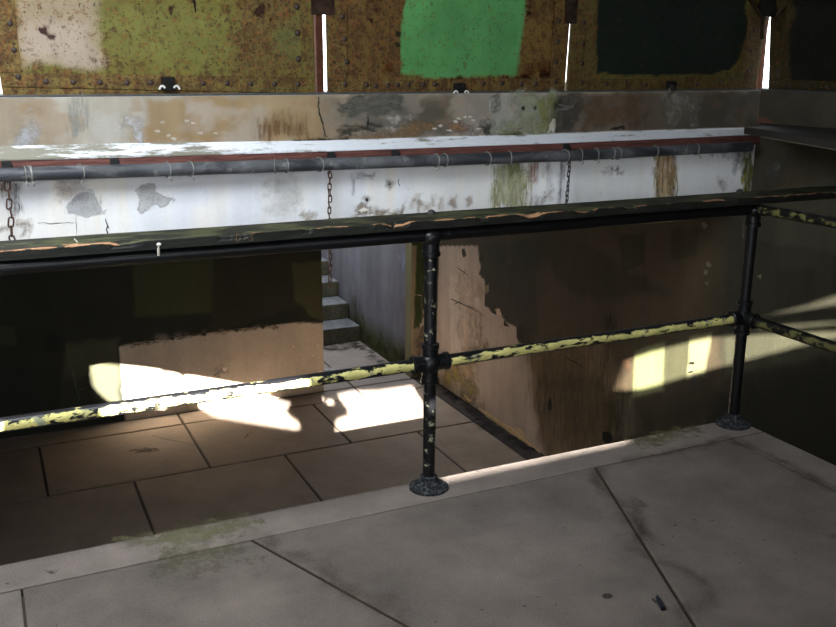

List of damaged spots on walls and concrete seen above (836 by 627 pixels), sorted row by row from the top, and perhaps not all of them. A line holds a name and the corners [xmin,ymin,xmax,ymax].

crack [317,97,327,141]
damp [337,92,403,140]
peeling [67,189,106,217]
peeling [134,183,176,213]
peeling [488,306,522,340]